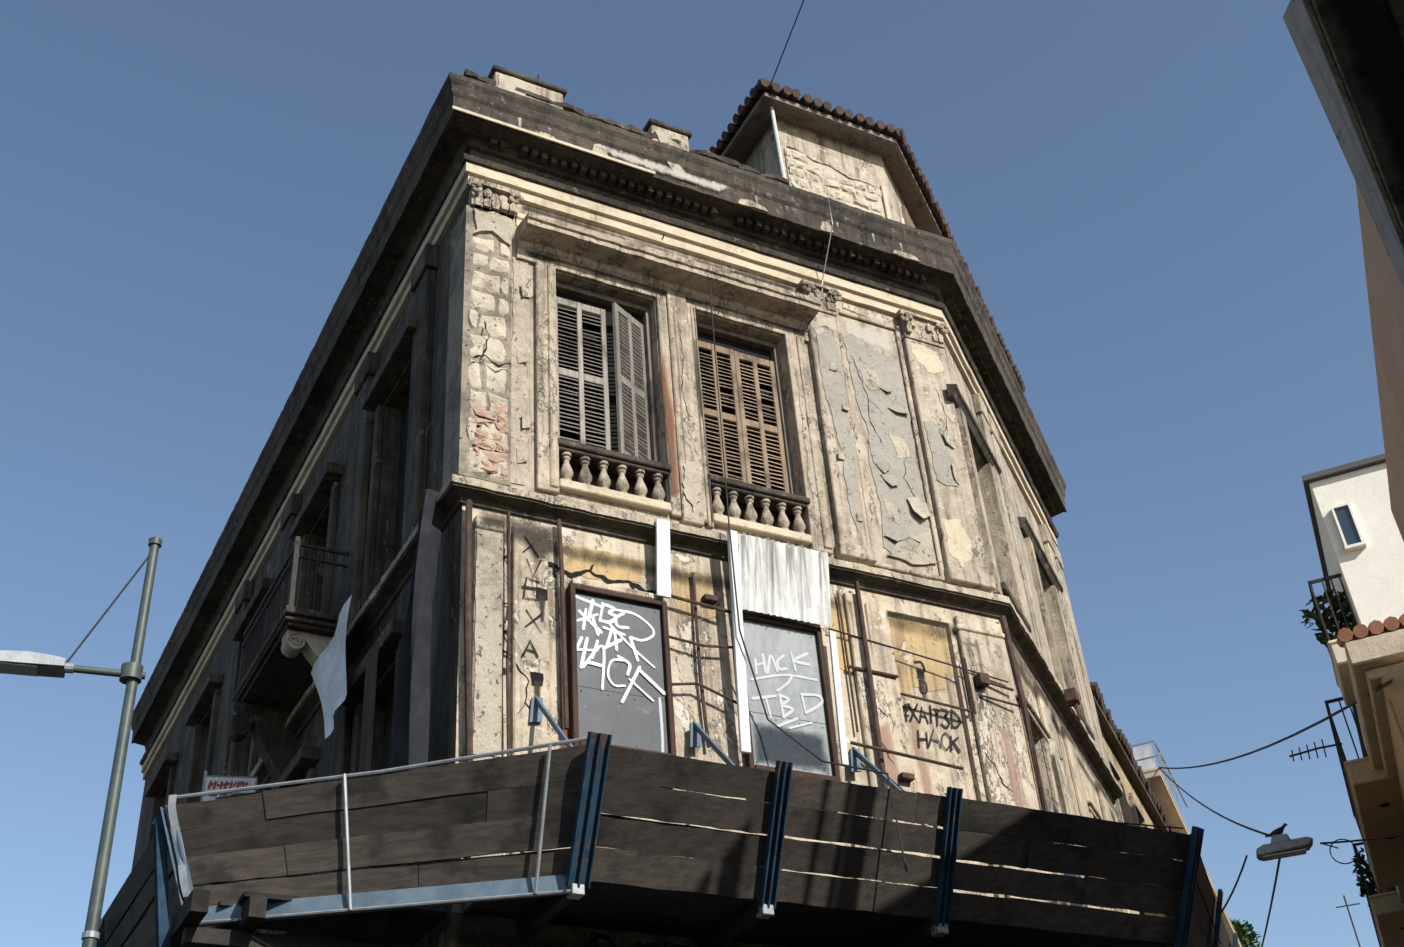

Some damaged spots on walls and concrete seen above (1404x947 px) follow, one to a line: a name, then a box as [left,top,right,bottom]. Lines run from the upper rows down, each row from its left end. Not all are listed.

peeling [472,208,530,486]
peeling [815,303,973,567]
crack [548,562,656,594]